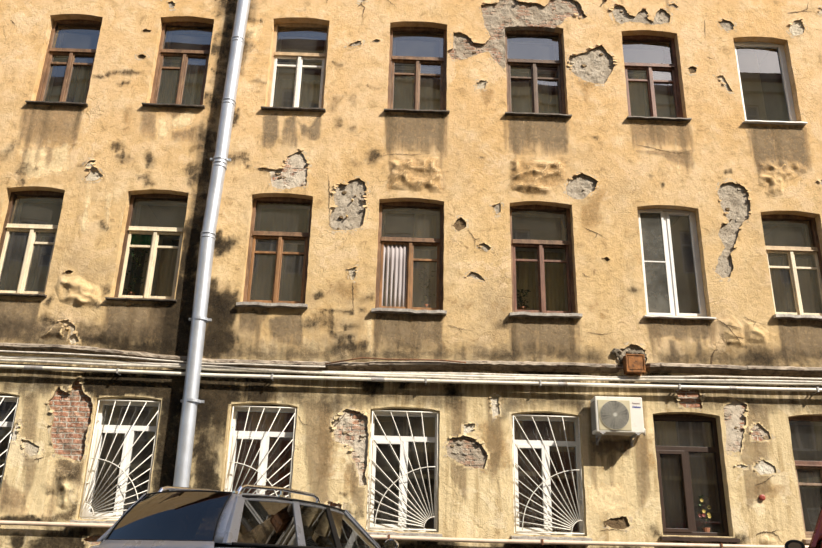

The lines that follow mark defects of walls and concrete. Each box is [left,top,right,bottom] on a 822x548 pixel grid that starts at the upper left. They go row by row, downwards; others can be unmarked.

flaking render [448,0,587,68]
leakage [0,0,236,356]
flaking render [328,176,370,234]
flaking render [713,177,752,282]
leakage [203,279,446,361]
leakage [649,319,822,366]
flaking render [11,375,95,464]
leakage [84,366,185,492]
leakage [190,371,413,491]
flaking render [329,405,369,486]
flaking render [443,421,491,473]
leakage [0,460,89,548]